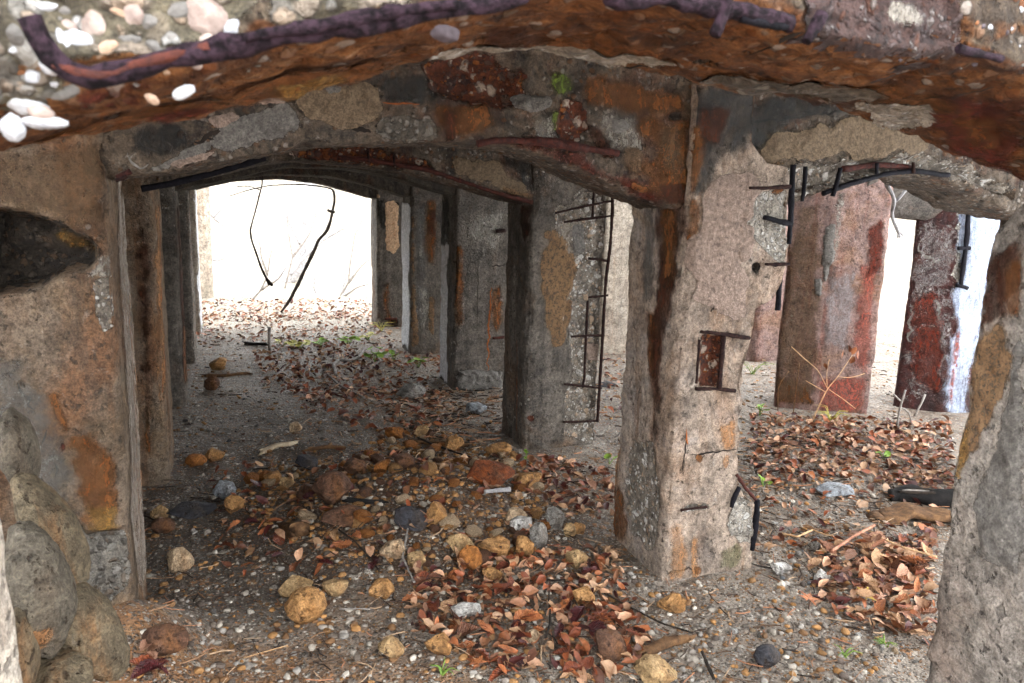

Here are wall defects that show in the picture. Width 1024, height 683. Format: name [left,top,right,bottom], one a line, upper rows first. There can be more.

spalling [0,209,114,332]
corrosion [48,393,118,531]
spalling [540,188,605,444]
corrosion [517,72,699,439]
spalling [695,330,751,393]
spalling [603,0,1013,320]
corrosion [776,208,884,412]
corrosion [909,292,944,392]
corrosion [957,242,1021,477]